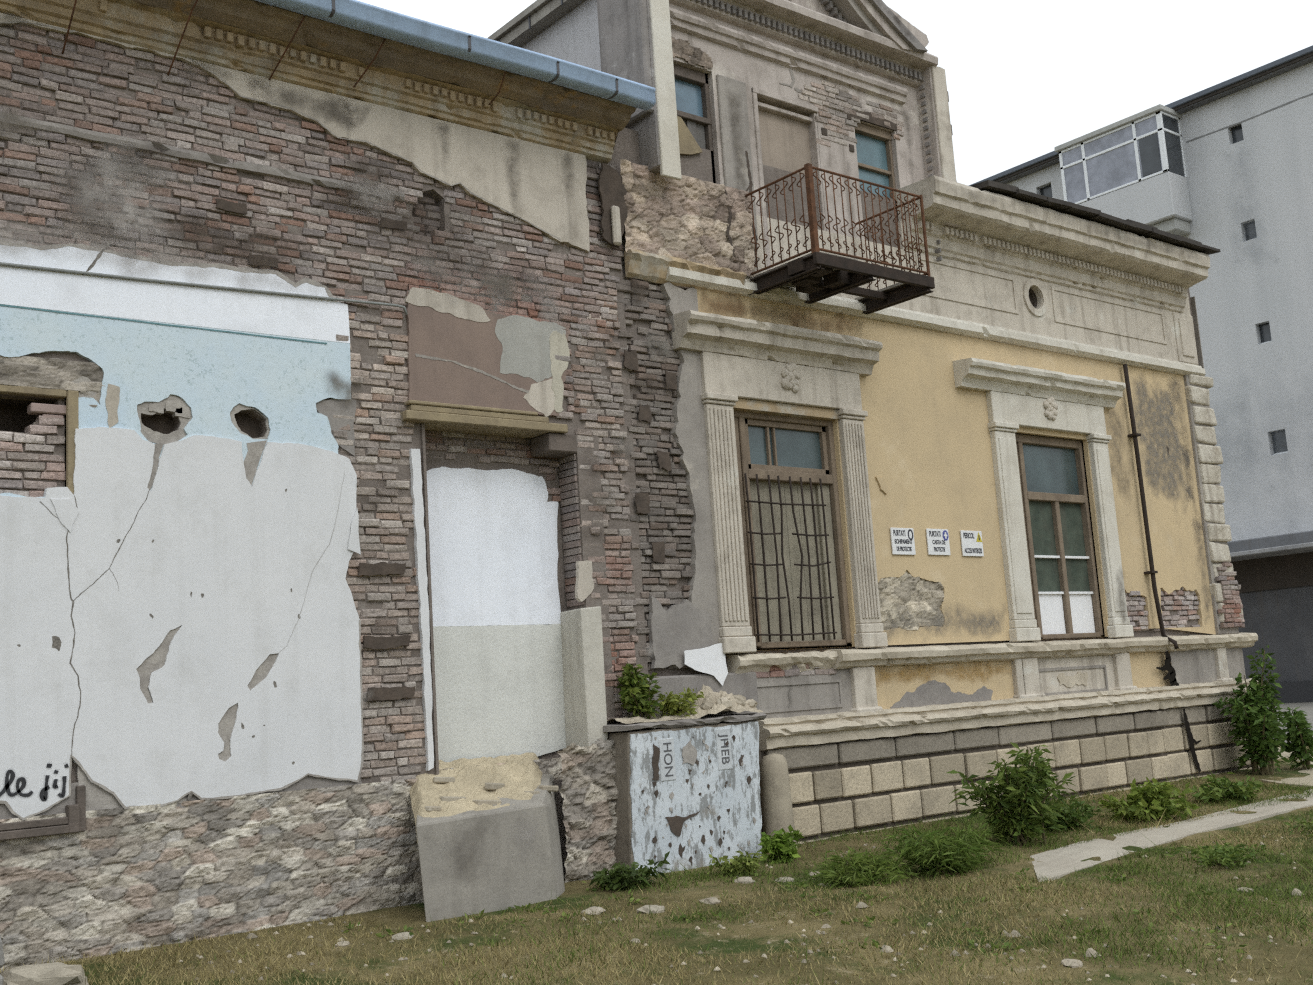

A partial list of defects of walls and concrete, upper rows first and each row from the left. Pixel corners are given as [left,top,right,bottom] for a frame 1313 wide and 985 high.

spalling [0,21,694,820]
water stain [1136,384,1191,496]
crack [40,489,150,756]
spalling [878,571,945,630]
spalling [1125,587,1200,631]
spalling [1215,562,1245,628]
peeling [642,737,750,867]